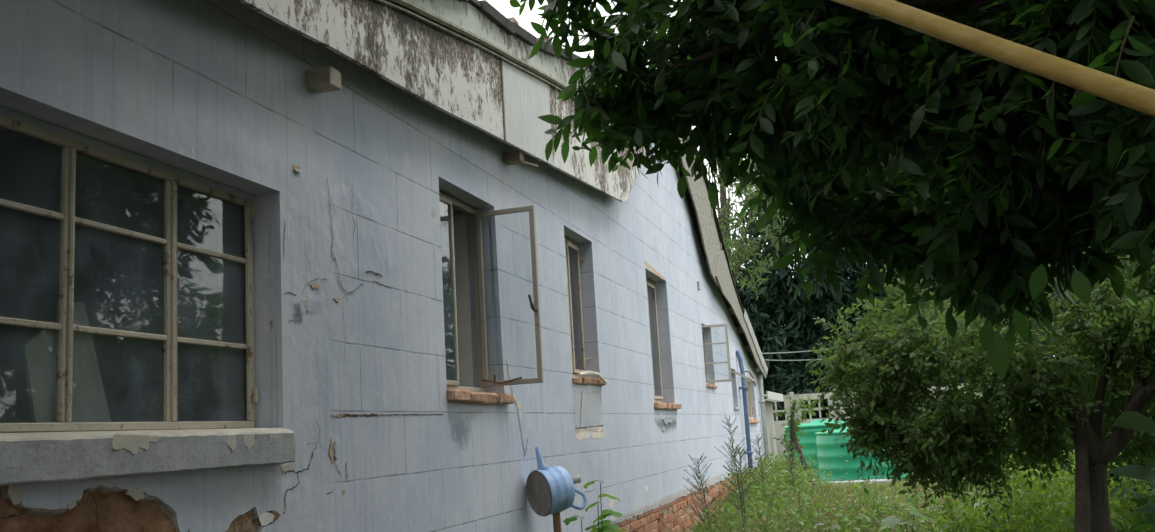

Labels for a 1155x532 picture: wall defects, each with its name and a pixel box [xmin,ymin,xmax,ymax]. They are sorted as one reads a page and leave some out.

crack [327,178,392,357]
peeling [327,439,348,495]
crack [281,413,444,514]
spalling [0,484,190,532]
spalling [225,507,280,532]